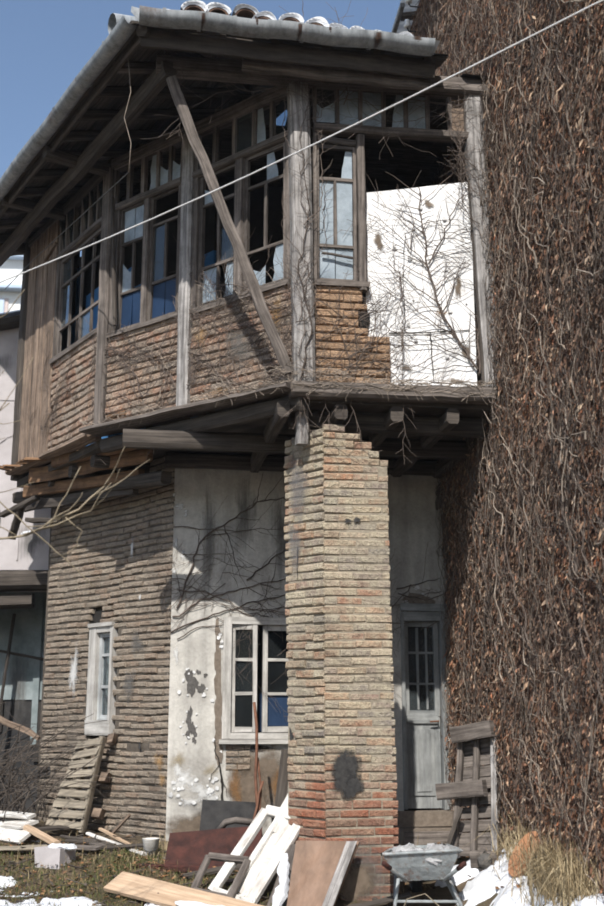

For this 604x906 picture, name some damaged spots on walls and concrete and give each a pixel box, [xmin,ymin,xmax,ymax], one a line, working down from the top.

spalling [177,618,272,770]
peeling [168,763,219,833]